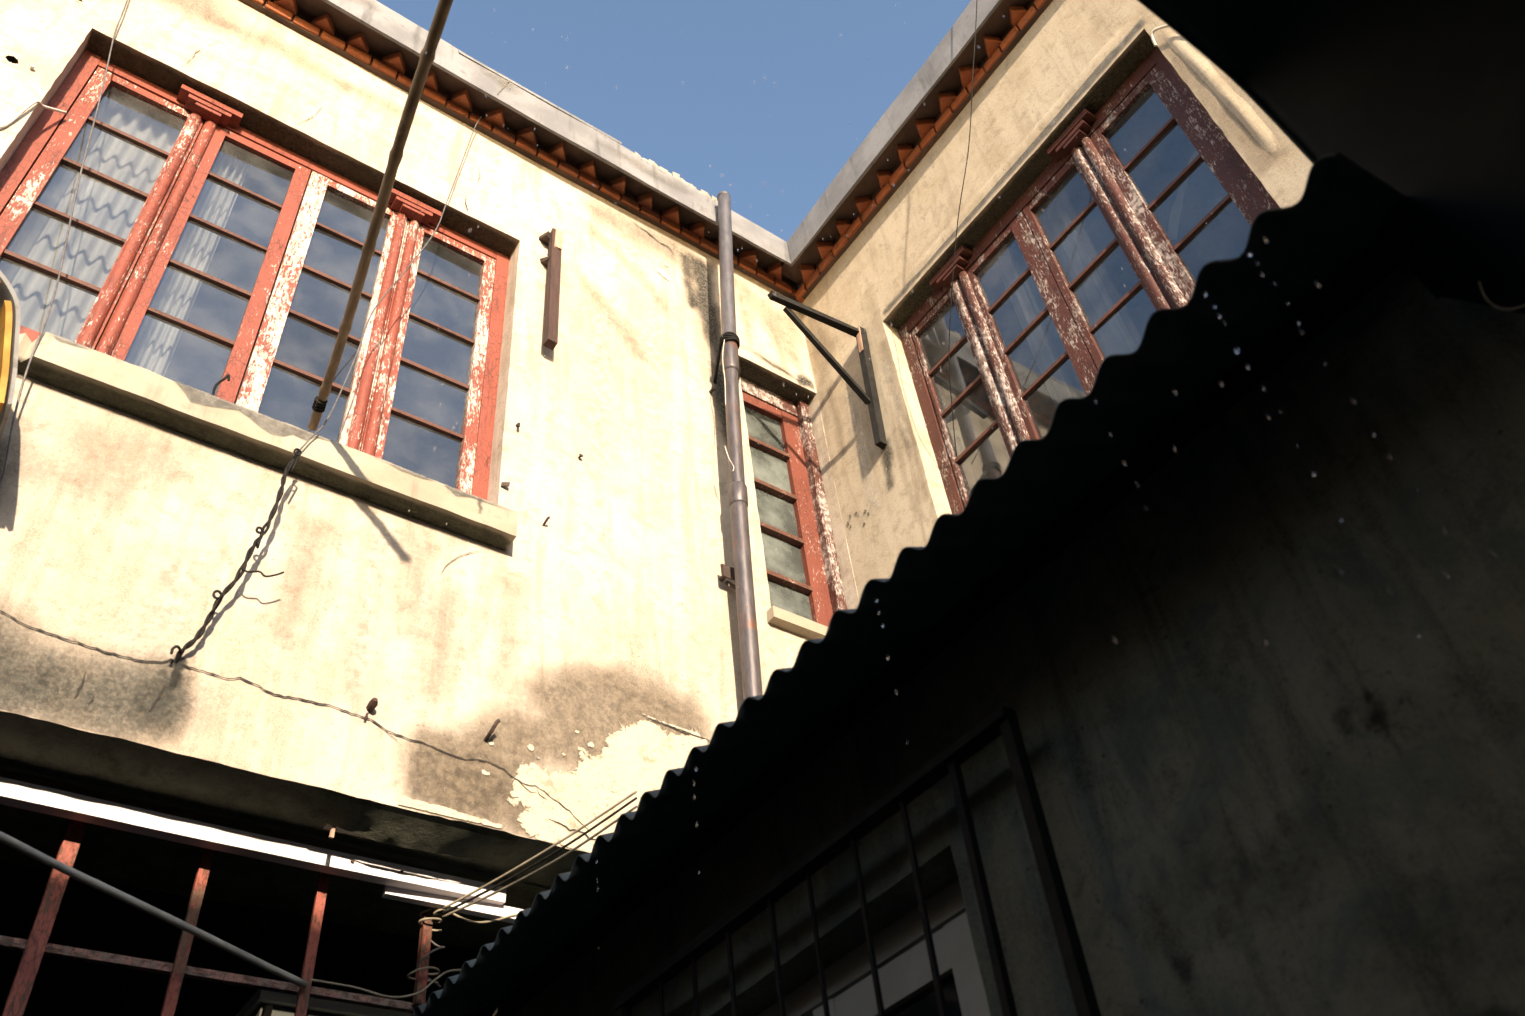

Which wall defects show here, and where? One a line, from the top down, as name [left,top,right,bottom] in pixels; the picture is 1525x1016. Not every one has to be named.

water stain [0,622,185,735]
crack [0,610,596,840]
flaking render [303,719,708,861]
water stain [411,671,702,827]